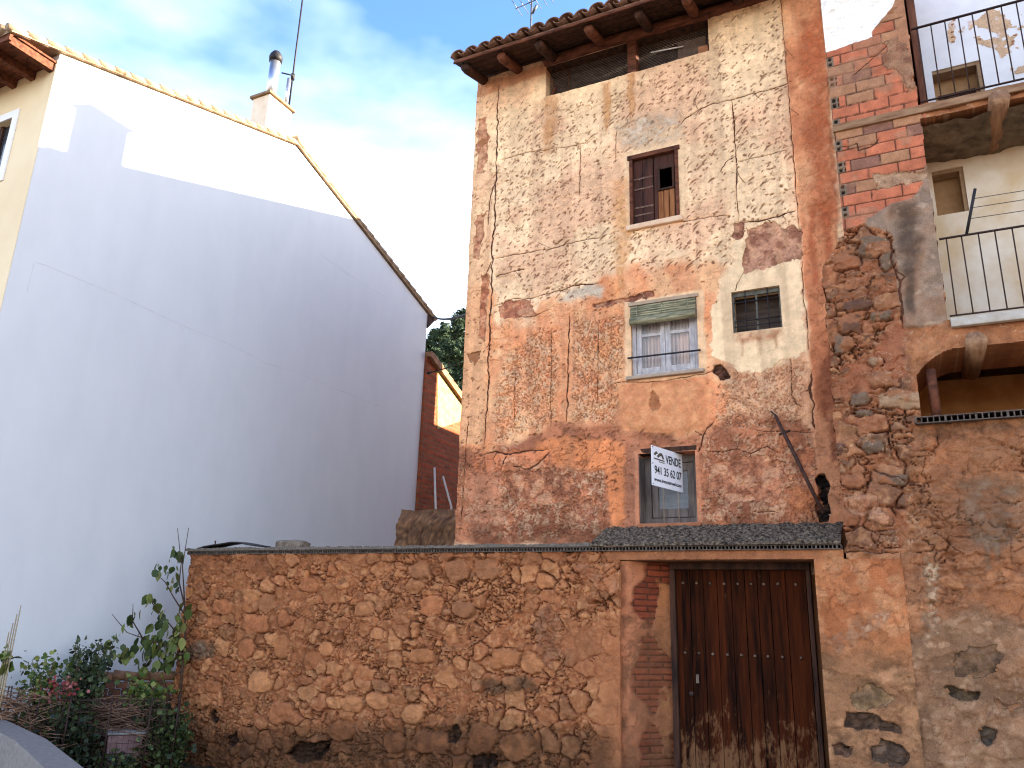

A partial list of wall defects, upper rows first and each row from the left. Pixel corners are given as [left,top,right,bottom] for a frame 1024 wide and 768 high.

peeling [947,9,1024,58]
spalling [882,37,916,89]
spalling [872,171,928,191]
spalling [732,221,803,274]
crack [461,85,602,518]
spalling [592,291,655,308]
spalling [712,364,731,381]
crack [695,264,815,463]
spalling [944,644,1003,701]
spalling [844,683,910,767]
spalling [978,725,997,746]